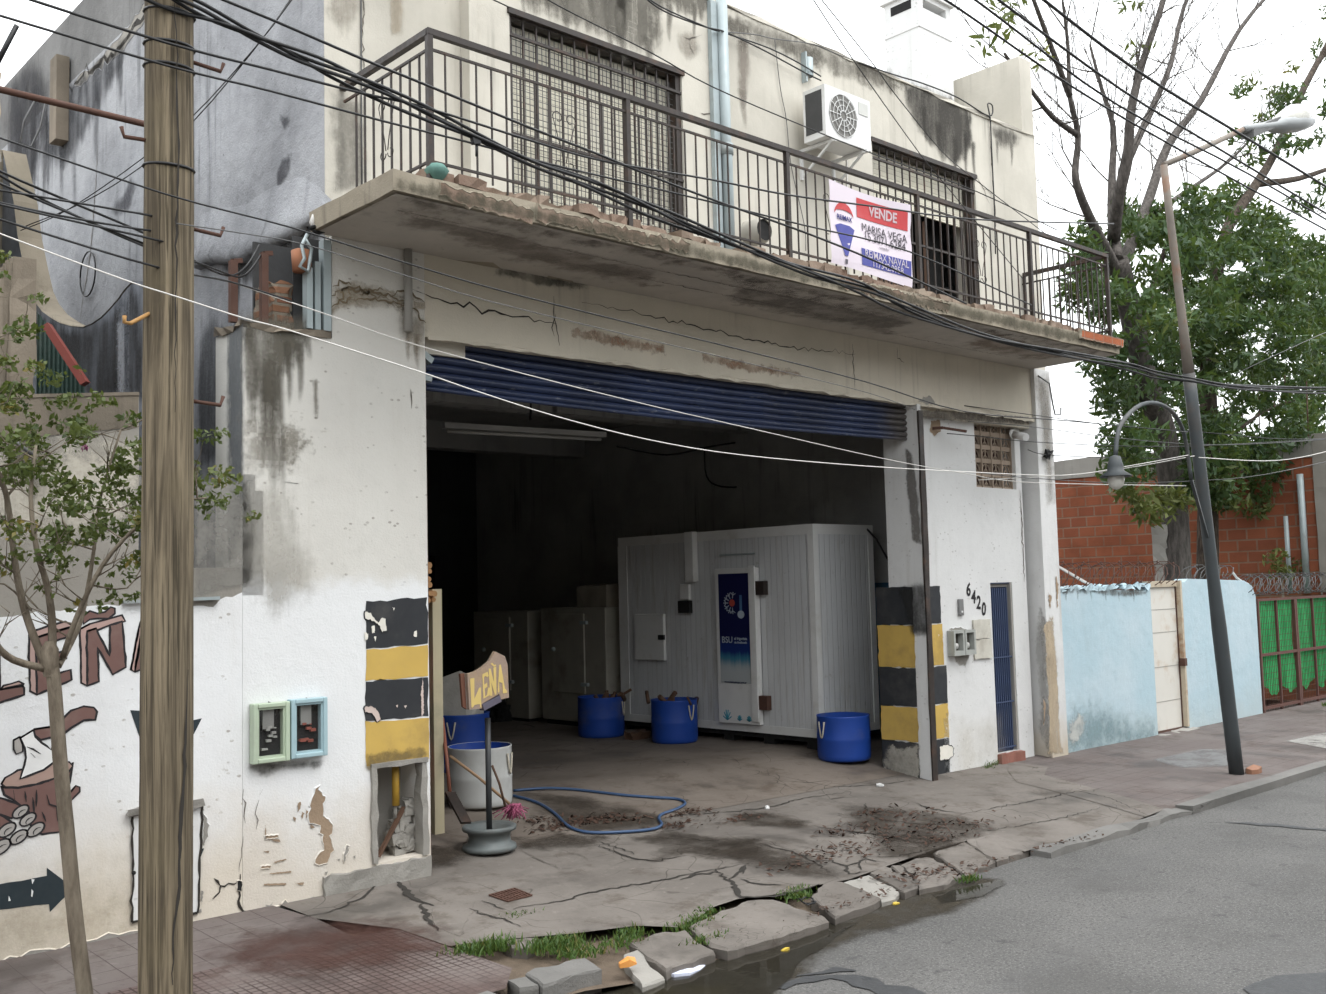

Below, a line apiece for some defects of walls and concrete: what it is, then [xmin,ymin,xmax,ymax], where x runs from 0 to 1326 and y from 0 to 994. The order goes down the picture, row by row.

damp [507,0,708,76]
damp [728,17,977,179]
damp [277,158,290,185]
damp [995,130,1015,143]
damp [199,316,317,502]
peeling [363,608,395,641]
peeling [363,705,381,723]
spalling [293,784,355,875]